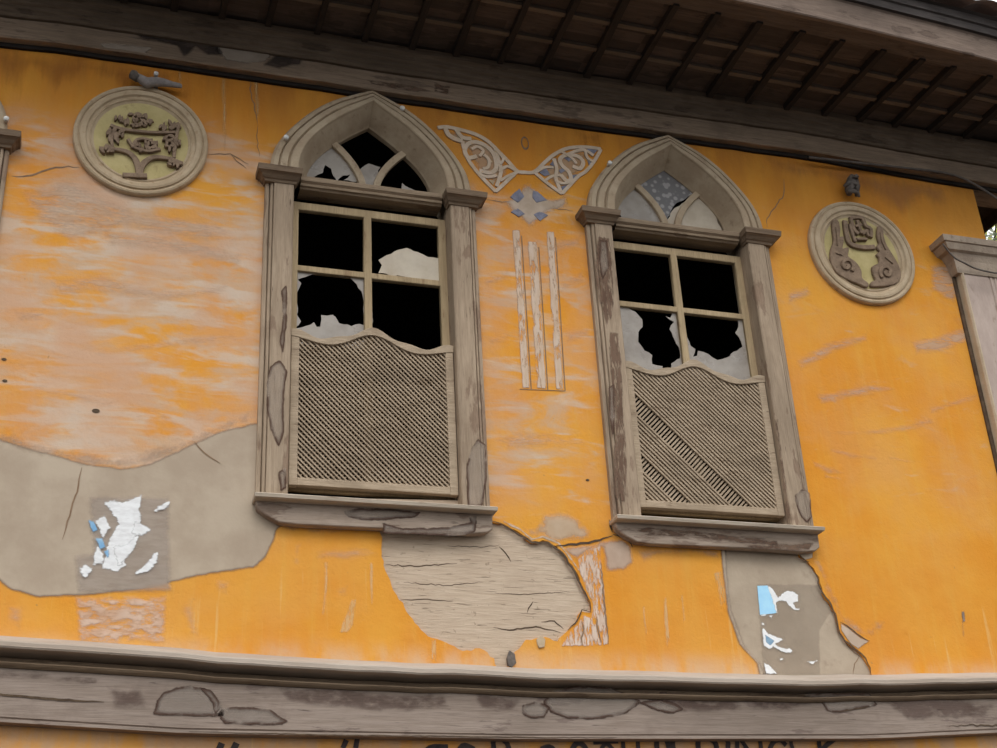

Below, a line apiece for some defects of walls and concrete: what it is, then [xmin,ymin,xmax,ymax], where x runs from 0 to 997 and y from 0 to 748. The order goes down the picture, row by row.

crack [211,82,260,166]
crack [14,166,79,177]
crack [62,468,82,539]
spalling [345,439,609,667]
spalling [640,527,870,676]
peeling [153,686,287,725]
peeling [522,686,683,720]